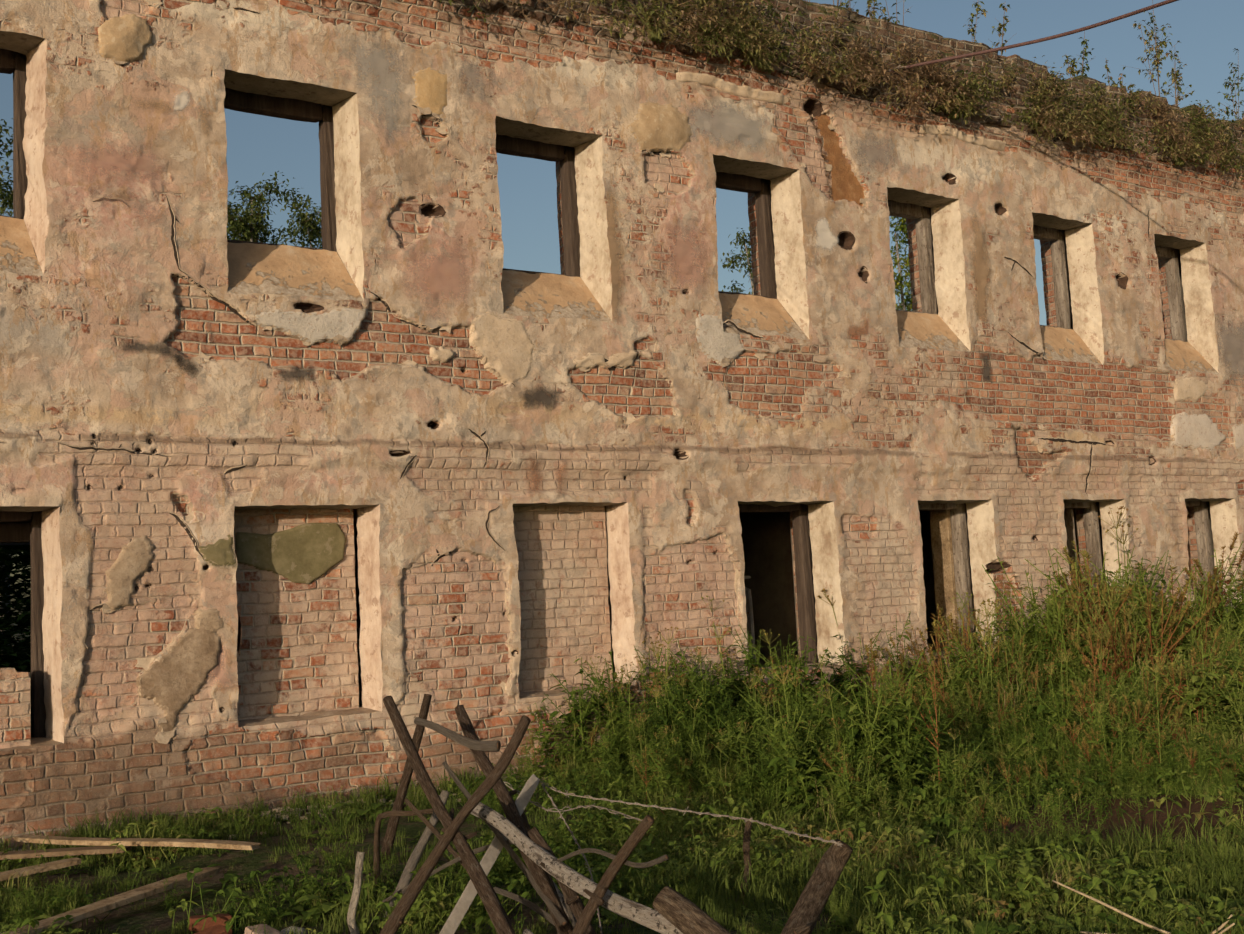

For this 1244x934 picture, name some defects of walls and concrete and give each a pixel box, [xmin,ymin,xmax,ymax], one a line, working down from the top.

crack [91,196,130,207]
crack [166,195,256,327]
flaking render [161,272,534,396]
crack [469,427,490,466]
flaking render [956,339,1244,482]
flaking render [82,537,242,744]
crack [169,511,205,561]
crack [429,549,454,568]
flaking render [400,547,557,757]
crack [485,506,506,551]
flaking render [622,491,746,722]
flaking render [181,726,396,796]